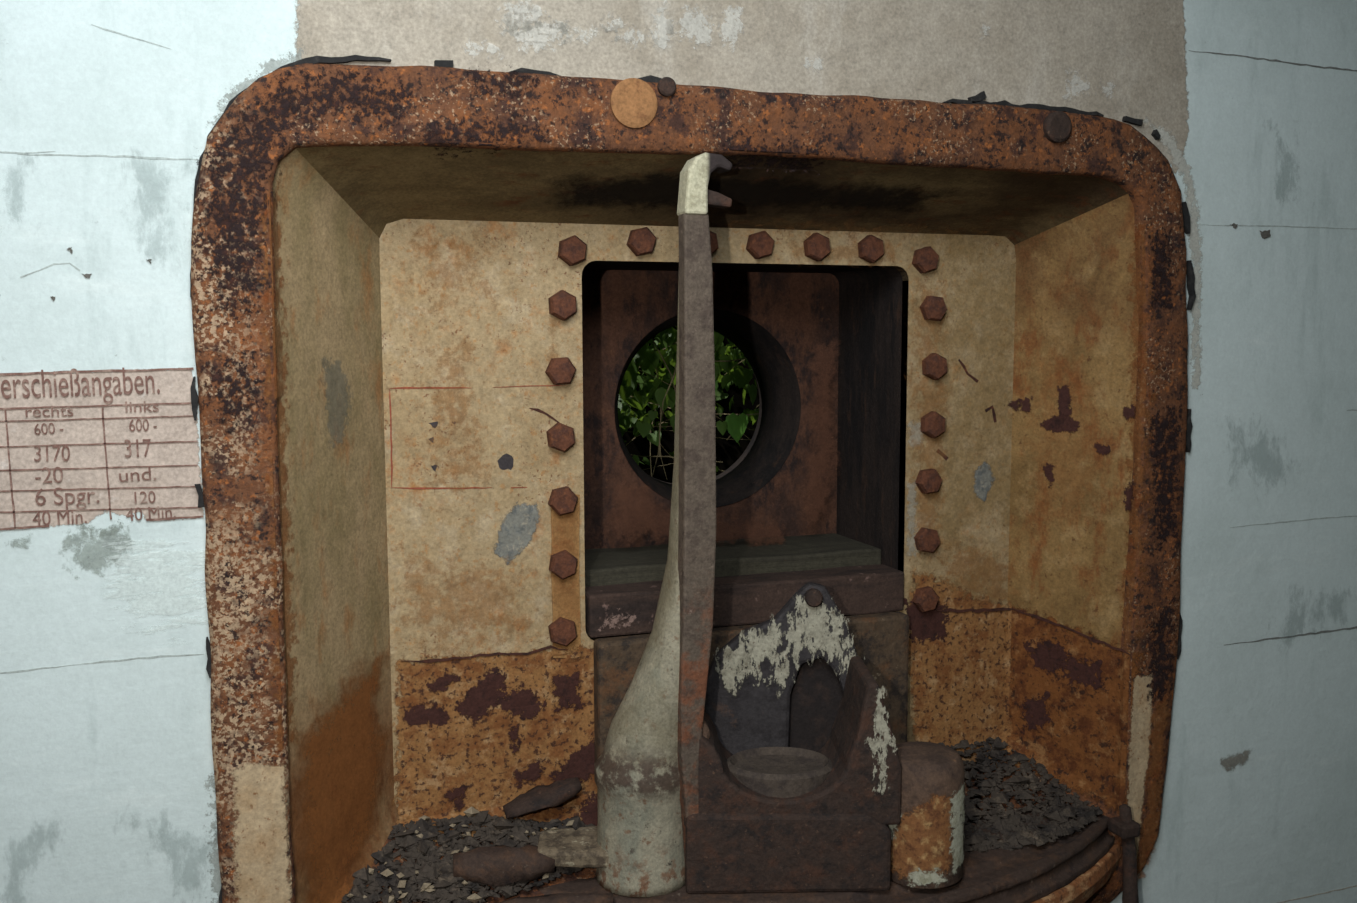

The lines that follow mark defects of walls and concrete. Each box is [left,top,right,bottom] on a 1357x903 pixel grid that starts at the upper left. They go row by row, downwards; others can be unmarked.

rust [191,65,550,752]
rust [392,645,598,842]
rust [722,132,832,175]
rust [888,223,1183,887]